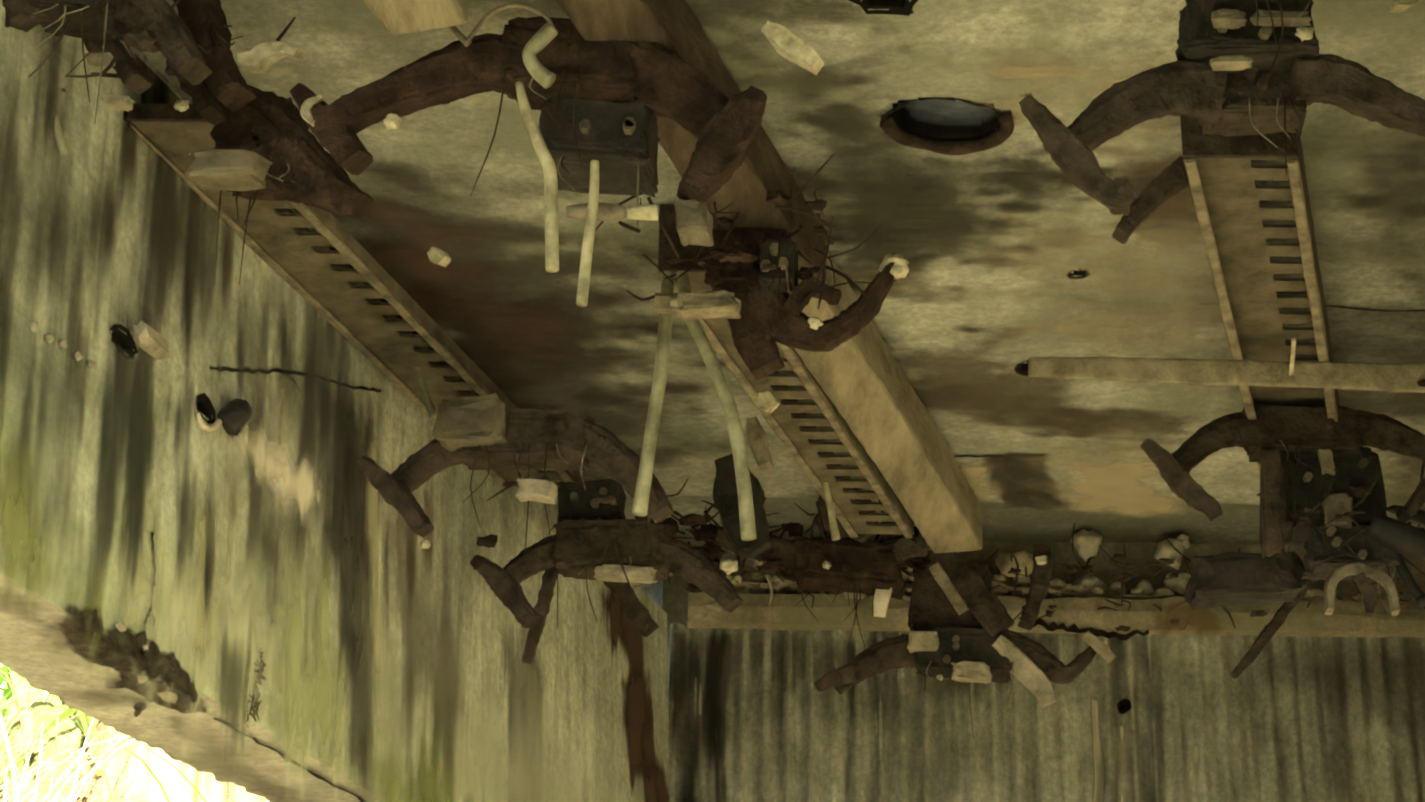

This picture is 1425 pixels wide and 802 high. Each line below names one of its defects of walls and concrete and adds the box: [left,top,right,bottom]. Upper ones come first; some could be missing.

damp [0,51,79,436]
damp [91,126,136,253]
damp [144,155,232,334]
damp [357,167,690,458]
damp [749,67,1073,296]
damp [100,351,153,633]
spalling [60,604,206,717]
damp [182,467,235,653]
damp [234,319,382,798]
corrosion [603,592,669,802]
damp [668,633,727,802]
damp [899,355,1175,515]